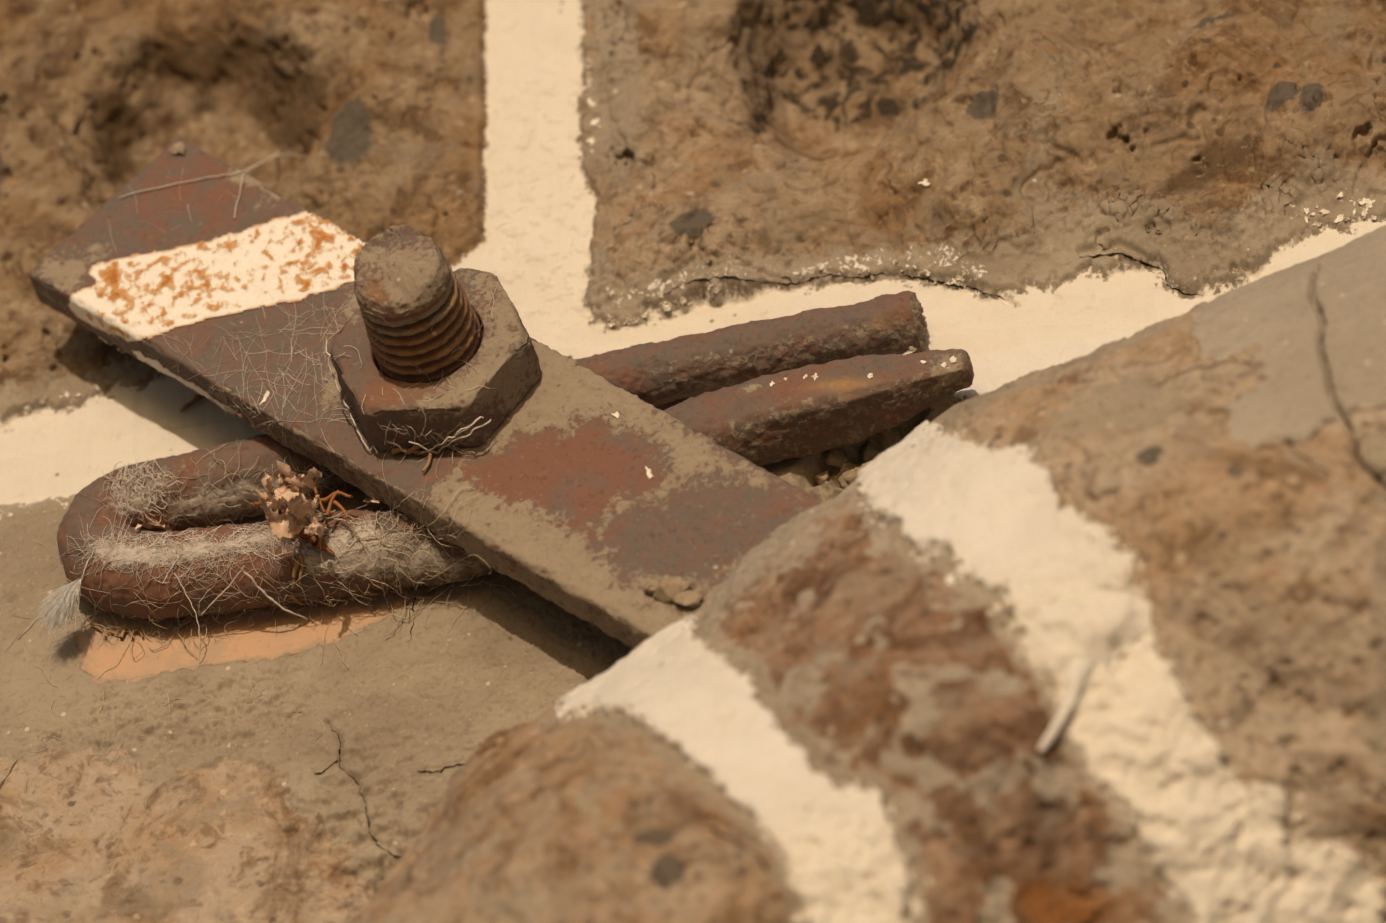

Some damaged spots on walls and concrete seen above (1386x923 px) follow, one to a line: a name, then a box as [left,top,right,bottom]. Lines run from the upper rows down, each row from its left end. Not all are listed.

corrosion [86,213,363,339]
crack [1251,268,1386,486]
crack [313,723,402,858]